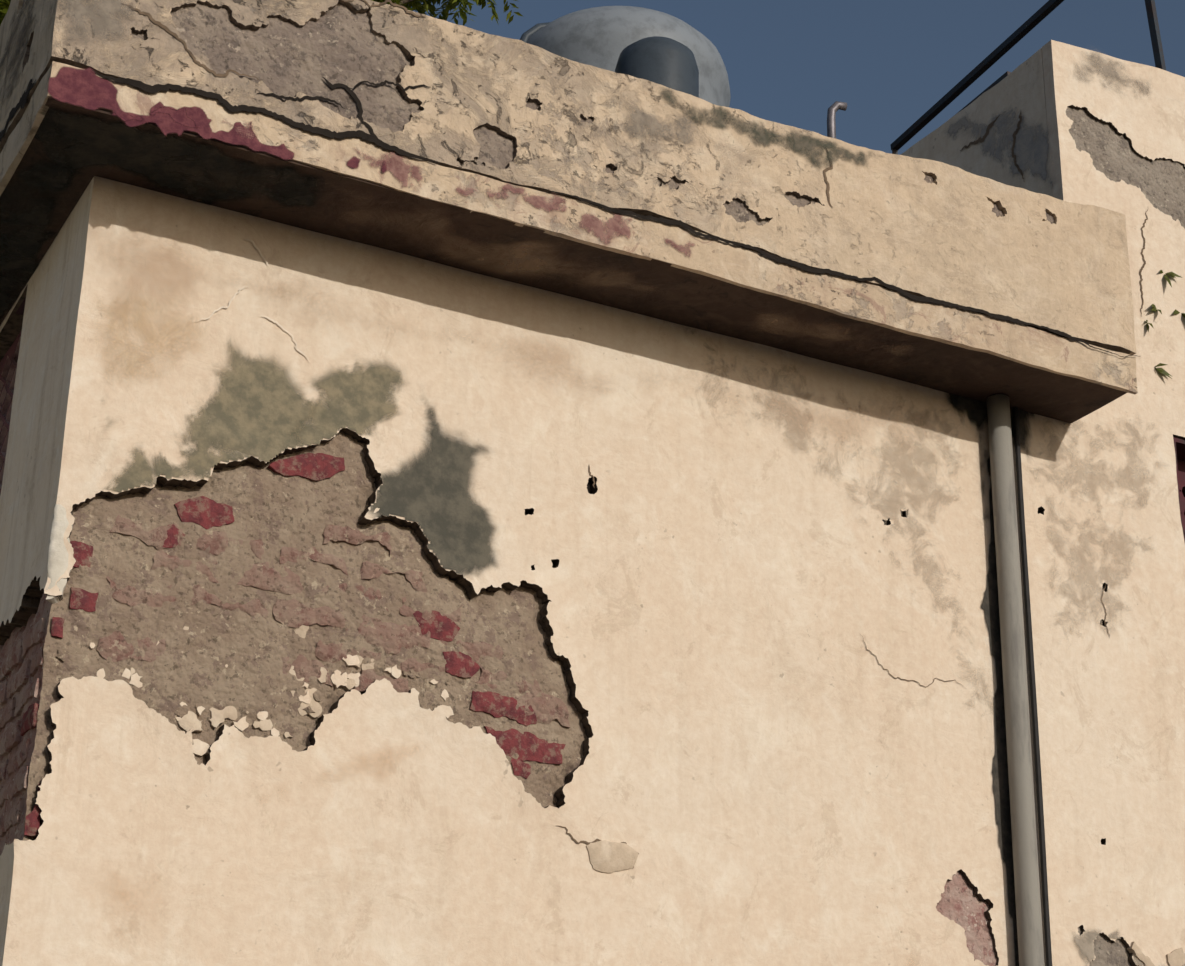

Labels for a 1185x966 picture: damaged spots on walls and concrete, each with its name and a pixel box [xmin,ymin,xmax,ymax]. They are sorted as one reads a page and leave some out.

water stain [0,107,320,318]
peeling [48,67,294,160]
crack [91,3,438,163]
spalling [170,3,421,132]
crack [823,149,833,207]
crack [543,190,1140,358]
spalling [1066,107,1185,229]
crack [1139,210,1148,317]
water stain [108,348,403,492]
water stain [370,408,495,575]
spalling [0,431,587,855]
spalling [936,871,997,966]